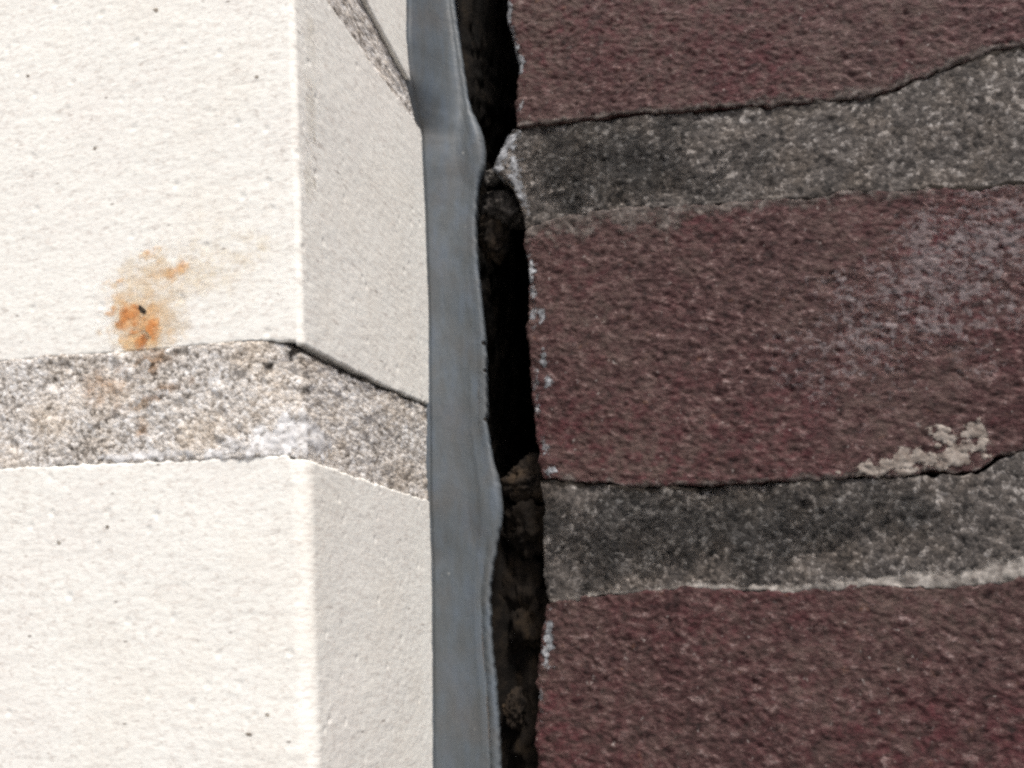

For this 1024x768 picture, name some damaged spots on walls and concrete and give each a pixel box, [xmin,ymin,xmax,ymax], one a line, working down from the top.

crack [551,47,1024,126]
rust [107,270,176,369]
crack [541,473,970,493]